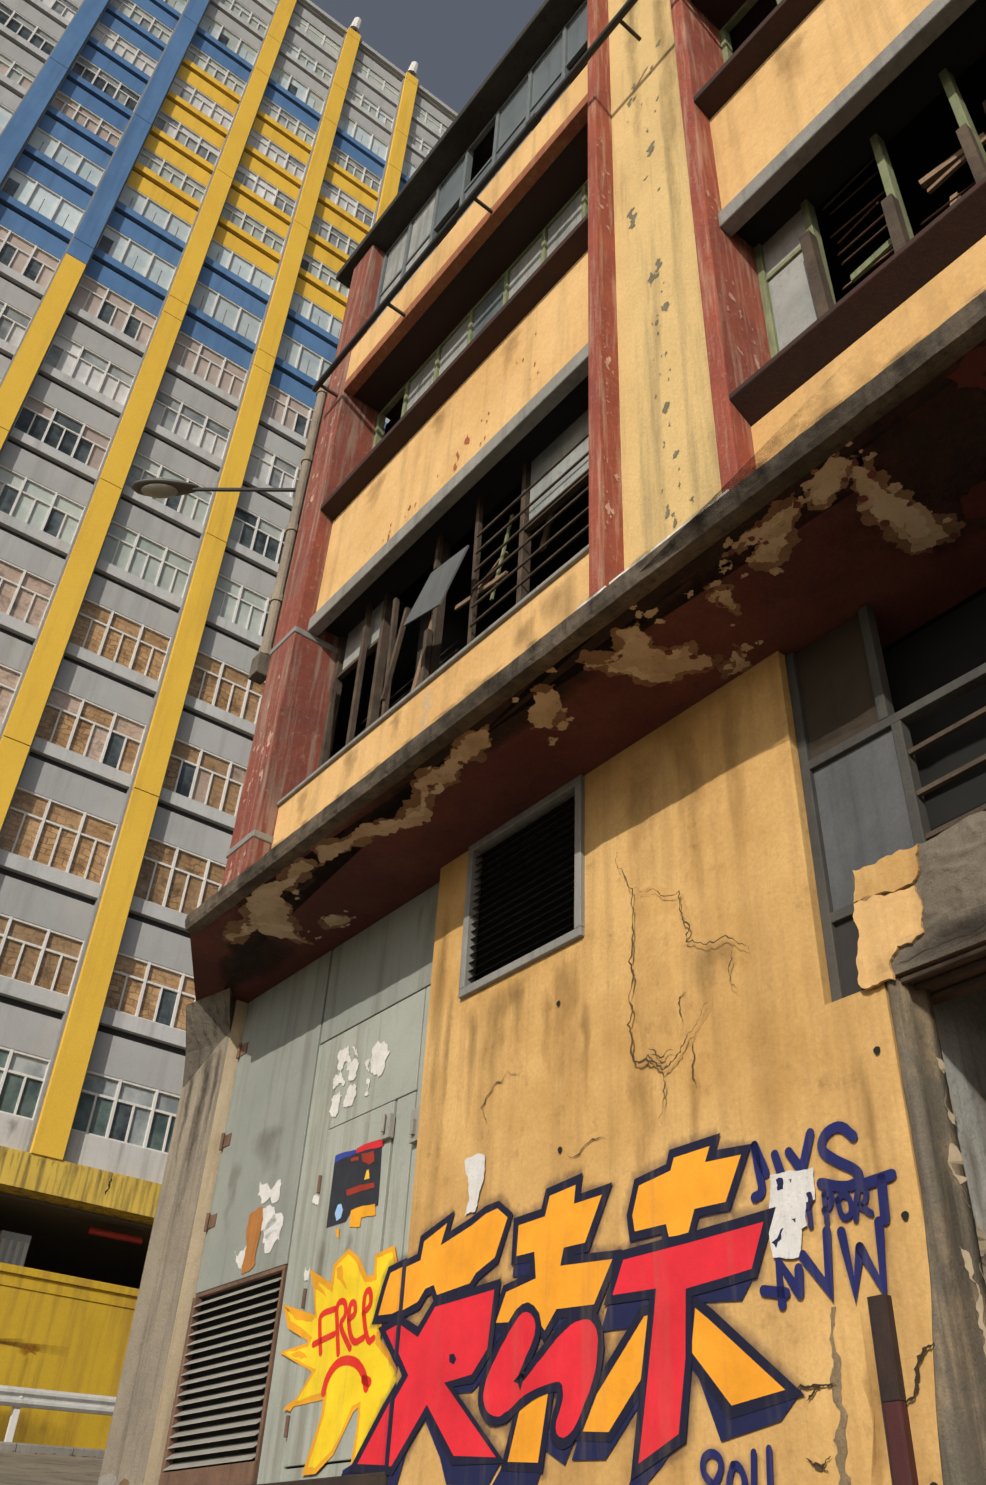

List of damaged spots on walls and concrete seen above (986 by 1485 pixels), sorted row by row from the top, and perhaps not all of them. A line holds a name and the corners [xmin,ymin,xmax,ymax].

peeling [574,441,966,687]
peeling [512,667,574,746]
peeling [223,724,493,945]
crack [615,856,750,1118]
spalling [852,811,986,990]
peeling [933,1053,956,1125]
peeling [948,1143,986,1355]
crack [905,1342,935,1407]